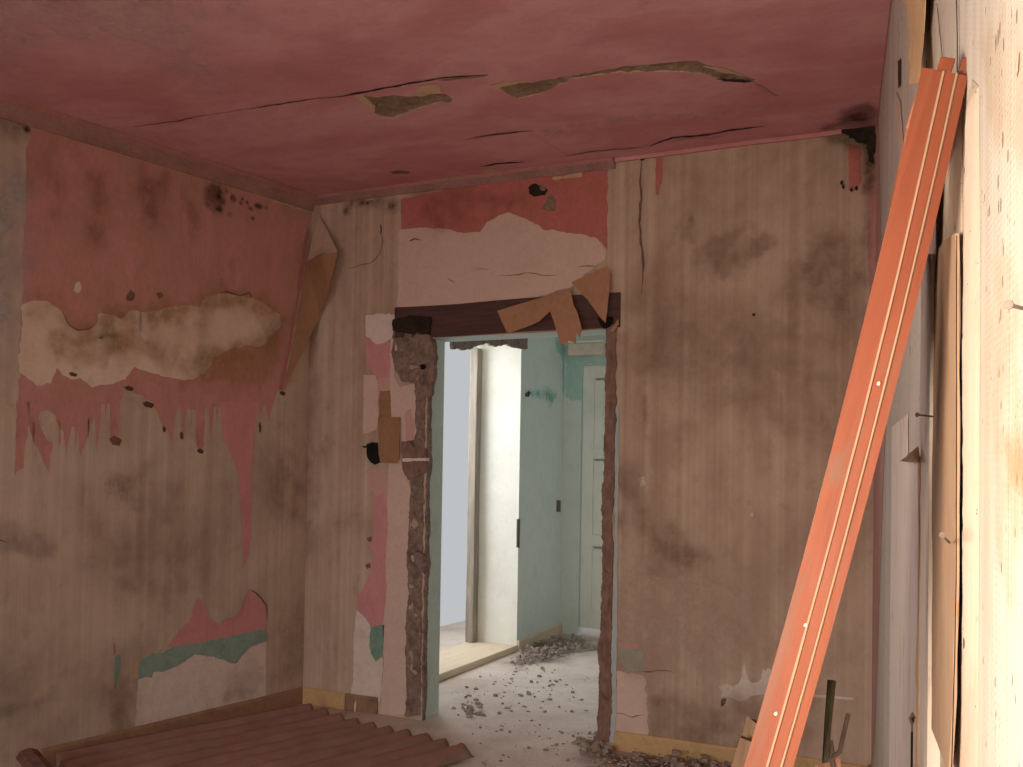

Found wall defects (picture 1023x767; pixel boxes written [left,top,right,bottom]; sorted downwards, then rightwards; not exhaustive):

crack [134,75,484,127]
spalling [354,83,452,117]
spalling [490,61,777,98]
crack [471,131,527,139]
crack [480,162,522,174]
water stain [841,109,876,172]
crack [568,126,764,295]
crack [482,265,596,276]
peeling [15,126,312,568]
flaking render [351,170,608,721]
flaking render [596,325,649,743]
flaking render [134,589,268,727]